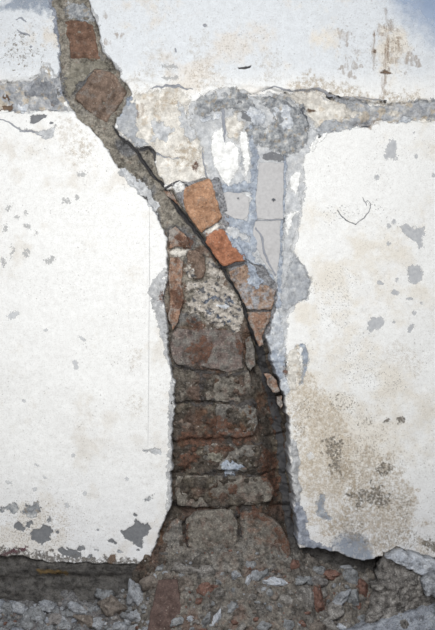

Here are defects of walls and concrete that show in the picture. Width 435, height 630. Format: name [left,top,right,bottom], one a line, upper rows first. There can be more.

crack [262,86,383,101]
peeling [387,219,425,249]
spalling [0,0,334,585]
peeling [408,265,424,284]
crack [112,125,294,537]
peeling [367,316,384,332]
leakage [320,436,344,482]
leakage [329,480,435,559]